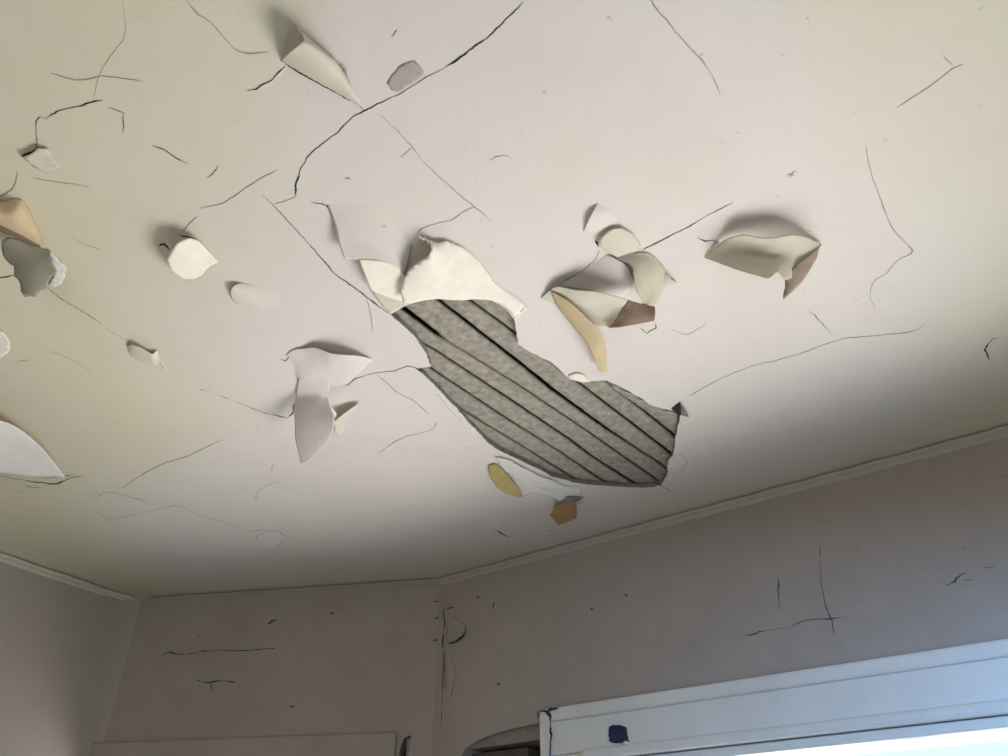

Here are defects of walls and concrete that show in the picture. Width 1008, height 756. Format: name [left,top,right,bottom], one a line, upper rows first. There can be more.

crack [0,6,142,196]
peeling [387,61,424,92]
crack [651,0,719,91]
crack [897,57,963,108]
crack [158,0,521,330]
crack [645,202,733,249]
crack [866,147,913,307]
crack [345,366,437,452]
spalling [394,290,689,484]
crack [692,309,926,395]
crack [3,475,79,492]
crack [743,548,846,636]